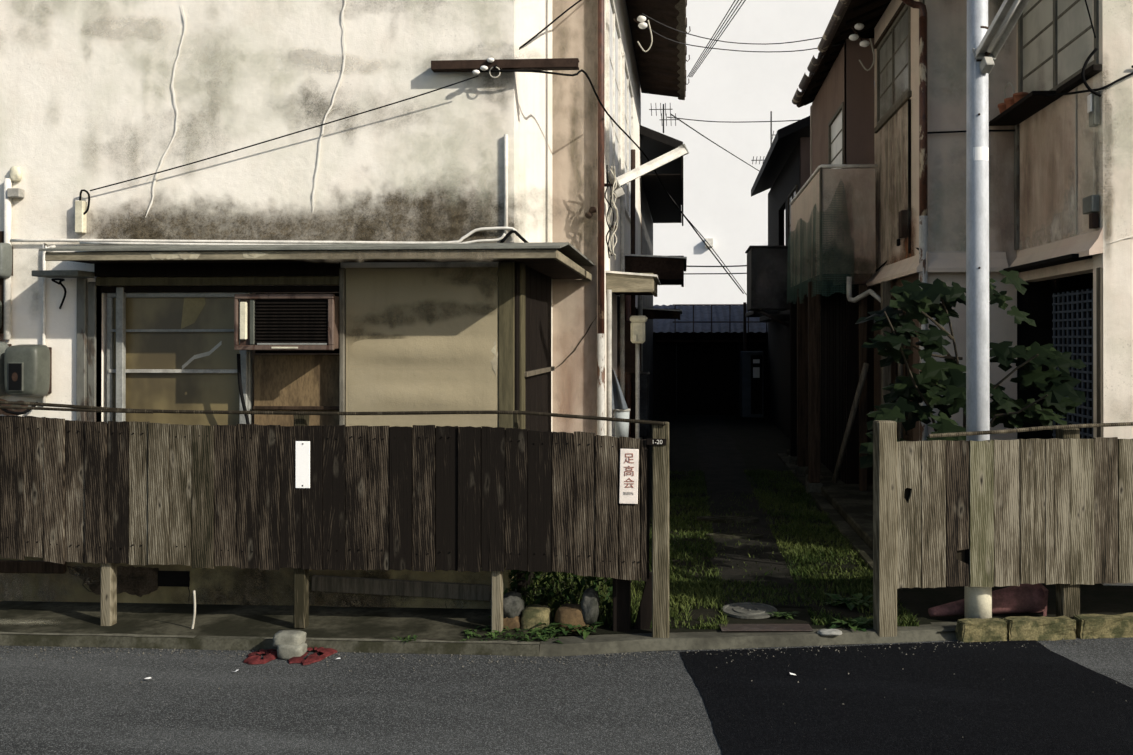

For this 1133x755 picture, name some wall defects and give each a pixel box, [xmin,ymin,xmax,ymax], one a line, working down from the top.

crack [146,4,186,216]
damp [88,186,523,251]
crack [312,0,346,211]
damp [807,91,908,277]
damp [1094,73,1113,239]